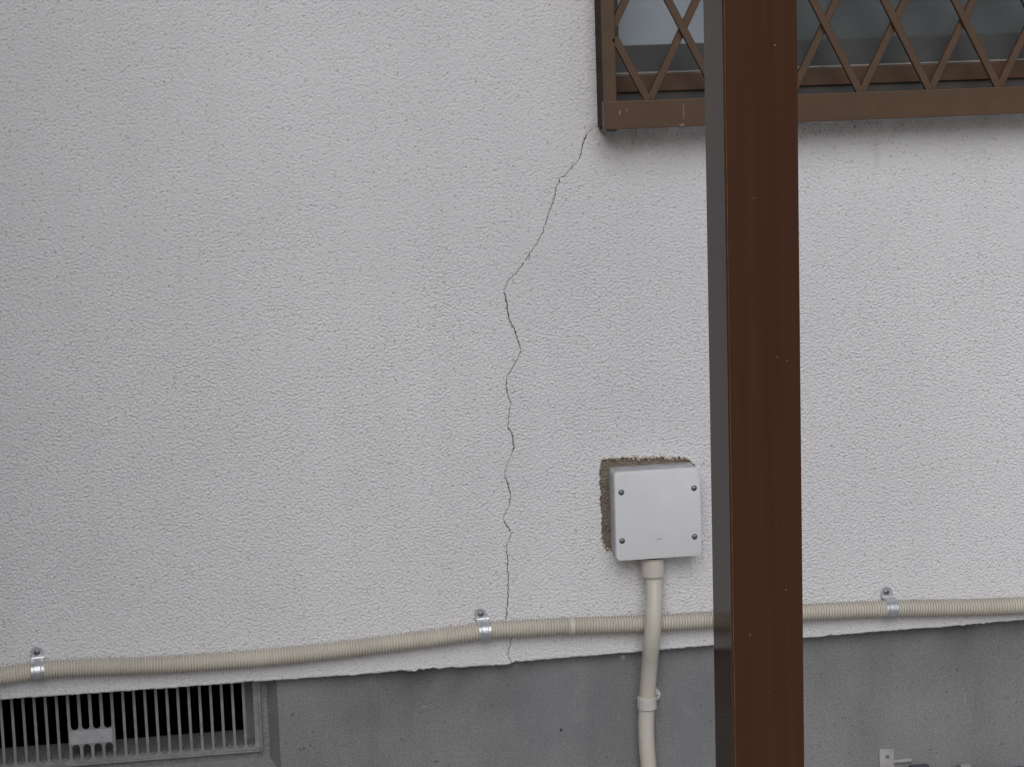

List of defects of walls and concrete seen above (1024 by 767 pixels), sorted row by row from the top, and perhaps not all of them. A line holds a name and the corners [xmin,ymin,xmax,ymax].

crack [503,130,592,664]